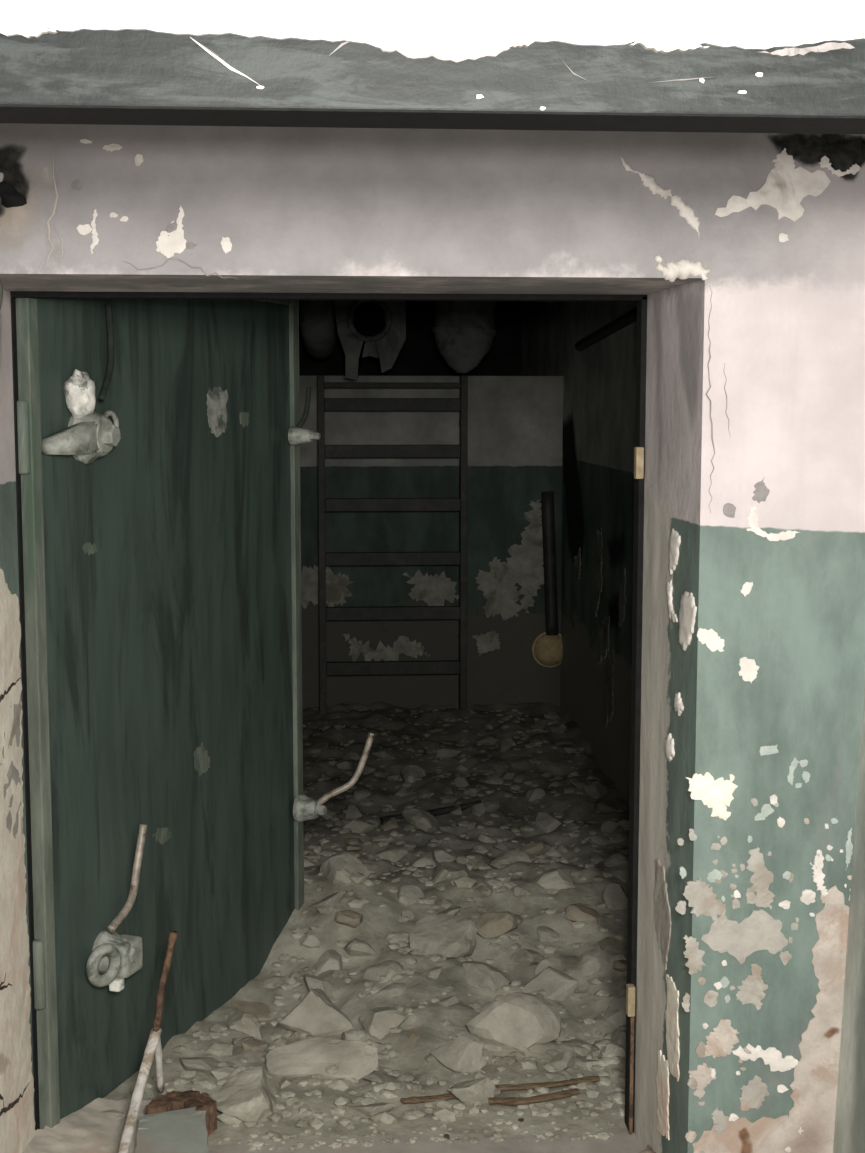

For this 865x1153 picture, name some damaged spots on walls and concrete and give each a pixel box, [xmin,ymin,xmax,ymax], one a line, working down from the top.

peeling [620,157,701,233]
flaking render [714,148,861,242]
flaking render [156,206,197,258]
peeling [472,492,544,657]
crack [0,678,22,702]
peeling [685,772,738,821]
peeling [751,794,785,828]
peeling [787,757,810,788]
peeling [0,569,35,1153]
peeling [653,818,853,1153]
crack [0,1083,29,1116]
rust [740,1129,751,1153]